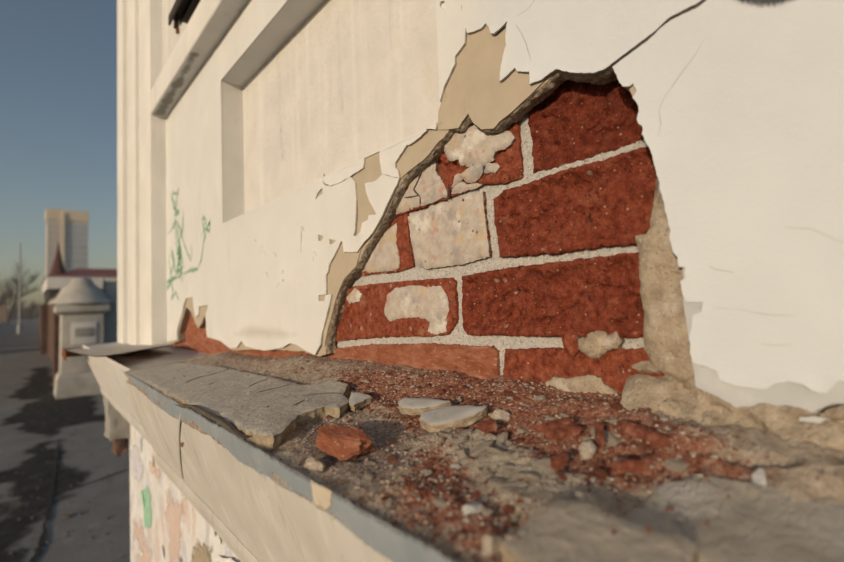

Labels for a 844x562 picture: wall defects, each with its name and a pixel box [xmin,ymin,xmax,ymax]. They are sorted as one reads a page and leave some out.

spalling [173,297,313,357]
spalling [319,26,844,452]
peeling [110,436,161,482]
peeling [125,373,451,562]